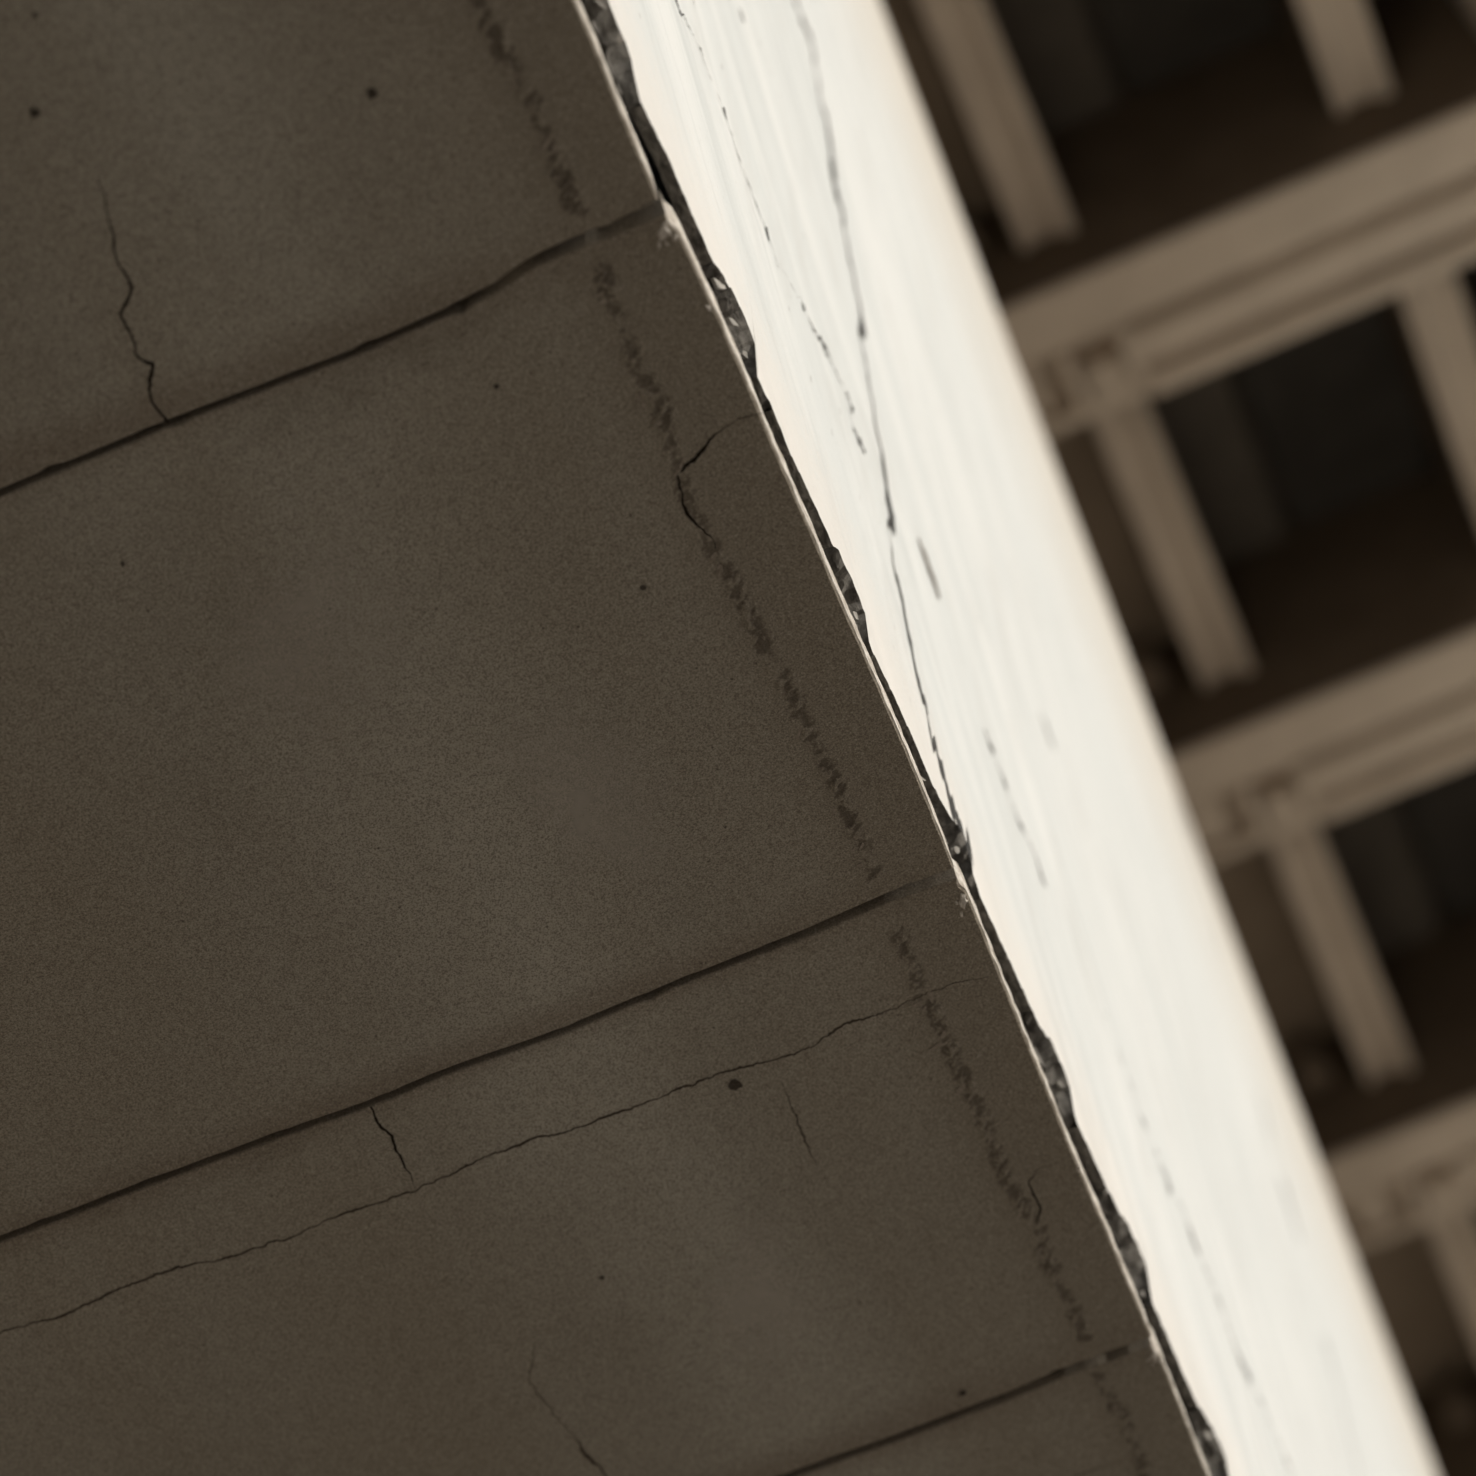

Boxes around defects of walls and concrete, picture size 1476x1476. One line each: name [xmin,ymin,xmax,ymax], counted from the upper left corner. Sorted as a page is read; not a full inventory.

crack [98,177,170,423]
crack [676,0,974,864]
crack [0,976,989,1334]
crack [529,1346,606,1476]